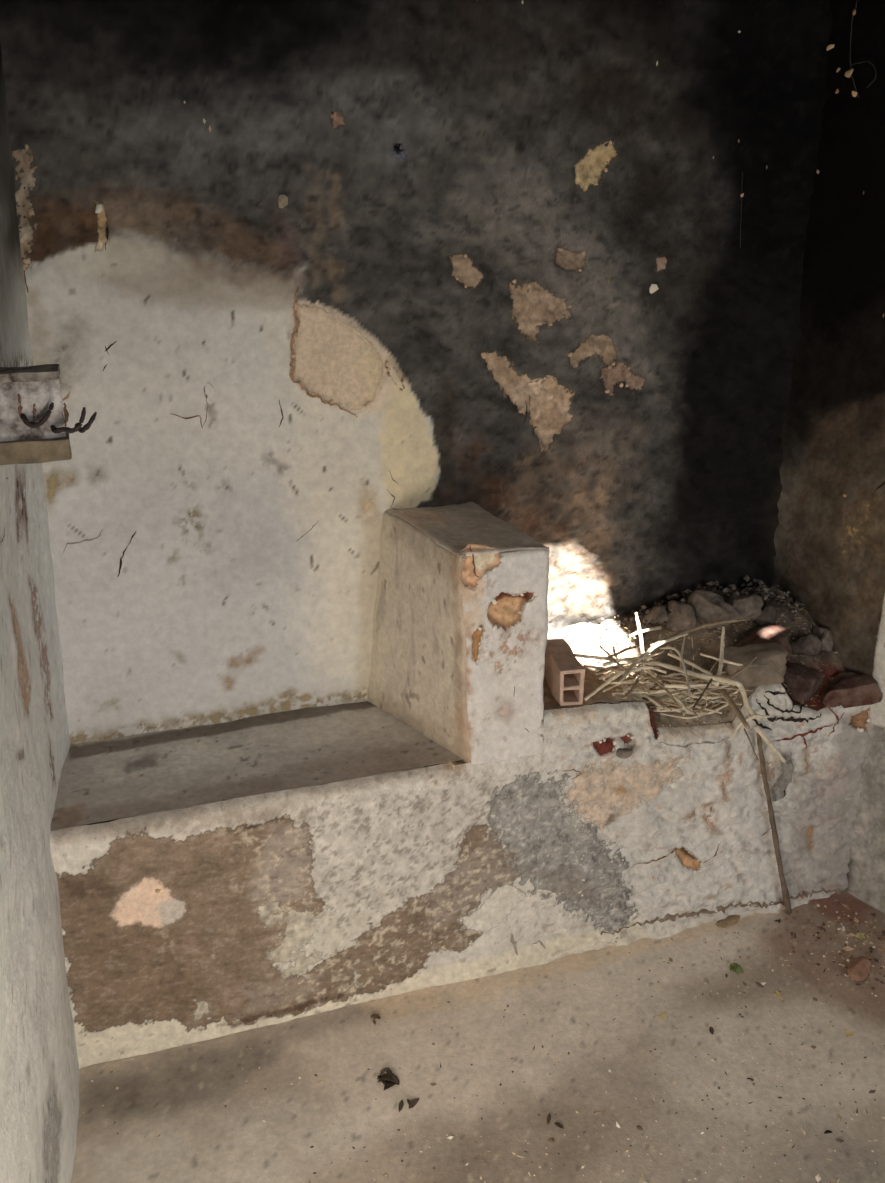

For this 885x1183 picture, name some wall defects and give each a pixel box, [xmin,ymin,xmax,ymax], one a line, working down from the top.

flaking render [574,141,617,191]
flaking render [12,144,38,272]
flaking render [449,254,483,288]
flaking render [289,271,405,417]
flaking render [509,279,571,344]
flaking render [566,334,645,396]
flaking render [481,351,575,452]
flaking render [461,544,504,589]
flaking render [472,592,535,662]
flaking render [460,733,682,939]
flaking render [110,877,186,928]